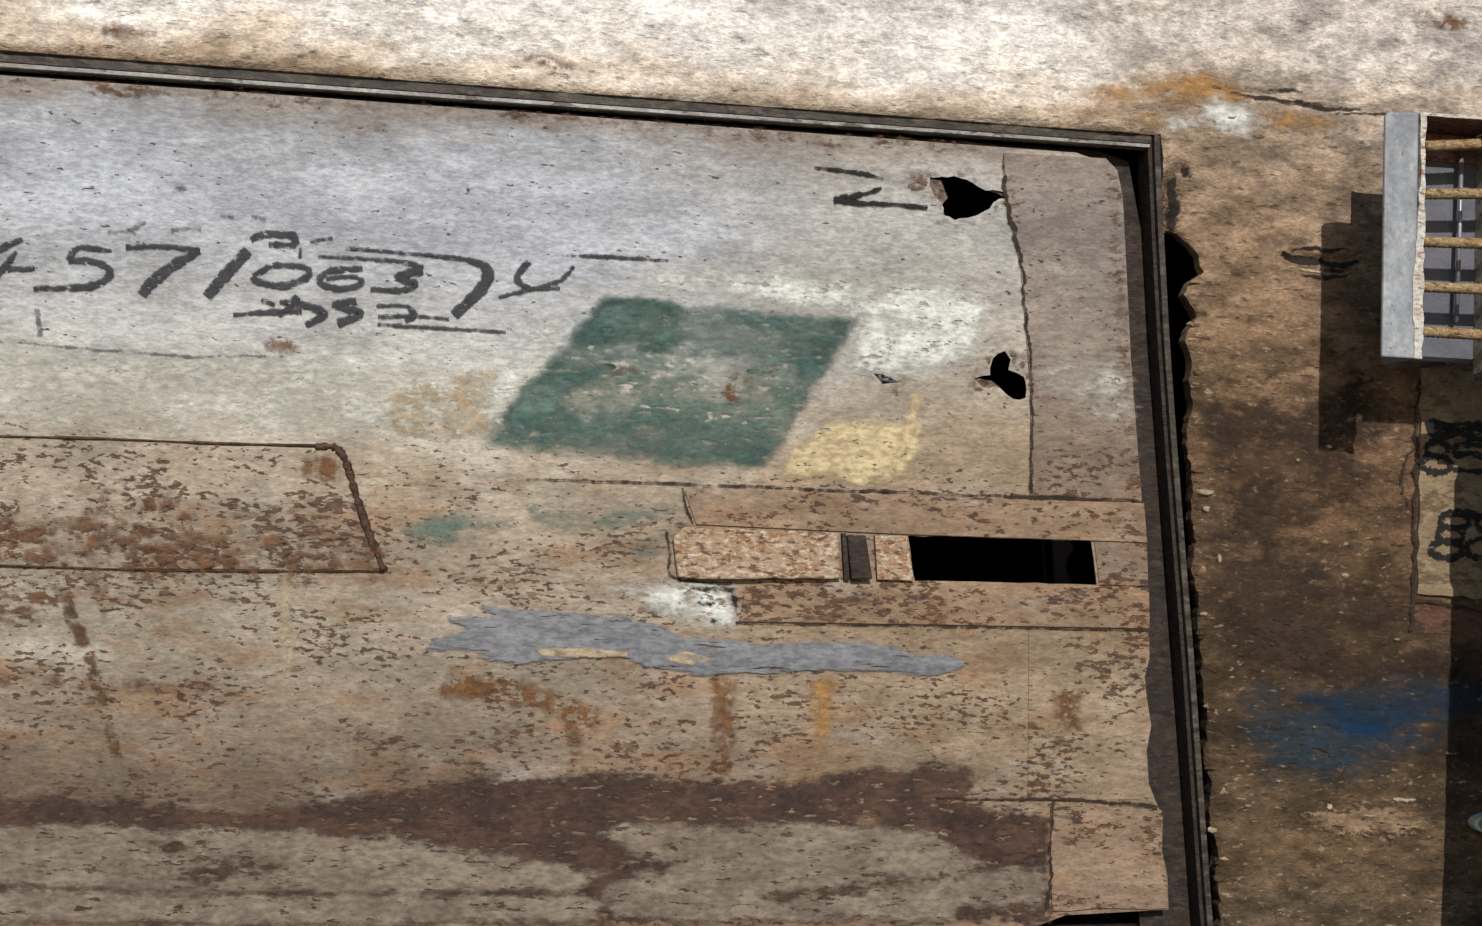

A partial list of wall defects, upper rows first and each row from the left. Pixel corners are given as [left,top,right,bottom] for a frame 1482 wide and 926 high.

spalling [0,71,1140,223]
peeling [391,269,987,465]
spalling [977,351,1026,400]
corrosion [302,455,338,480]
spalling [1163,162,1221,740]
corrosion [0,493,385,705]
spalling [908,536,1096,585]
corrosion [441,673,596,755]
corrosion [713,680,734,773]
corrosion [1059,691,1080,727]
peeling [0,762,1137,926]
peeling [1307,798,1425,839]